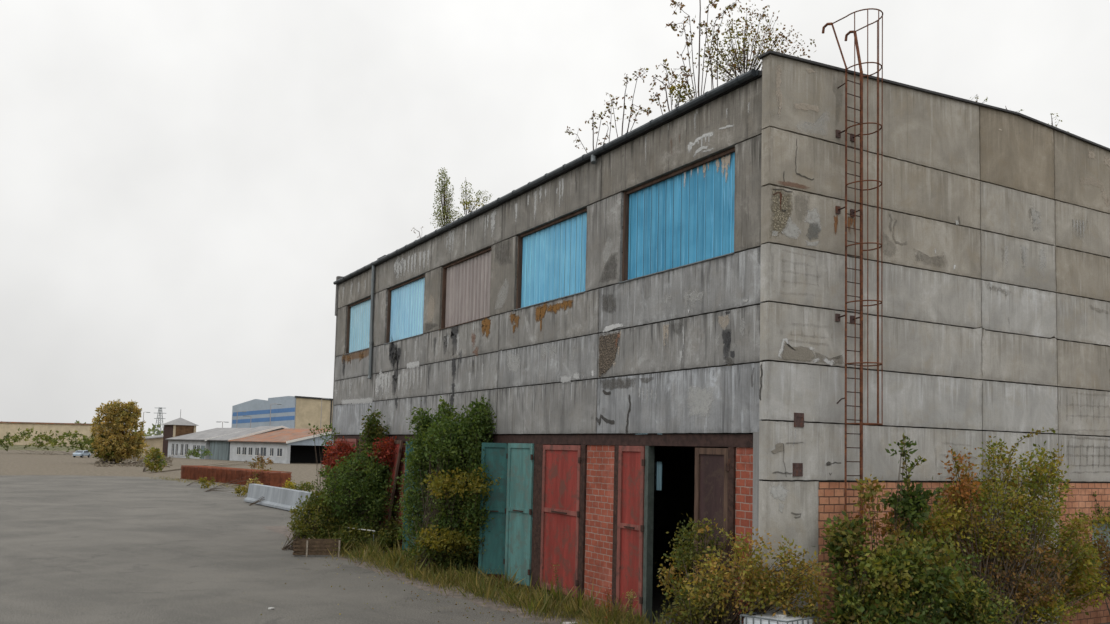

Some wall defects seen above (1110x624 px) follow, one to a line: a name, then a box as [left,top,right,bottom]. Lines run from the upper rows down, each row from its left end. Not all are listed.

spalling [771,188,792,233]
rust [471,318,491,355]
rust [535,300,573,331]
leakage [342,341,420,408]